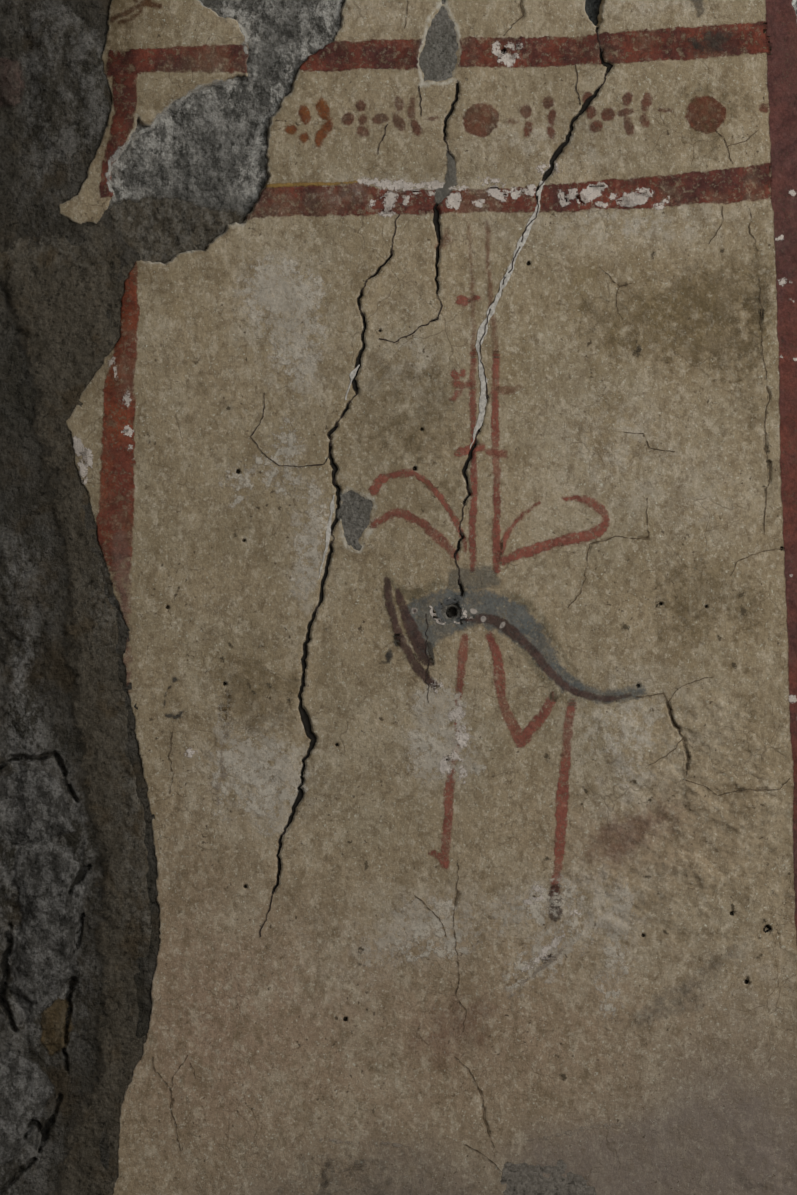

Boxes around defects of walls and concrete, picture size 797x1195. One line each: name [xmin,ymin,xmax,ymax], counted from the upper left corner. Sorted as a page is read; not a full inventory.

spalling [419,0,459,82]
crack [503,0,524,36]
peeling [357,161,560,217]
peeling [558,182,670,210]
crack [455,25,613,597]
crack [602,270,632,319]
crack [250,83,459,937]
spalling [337,490,373,551]
crack [568,498,650,608]
spalling [0,0,345,1195]
crack [636,677,790,796]